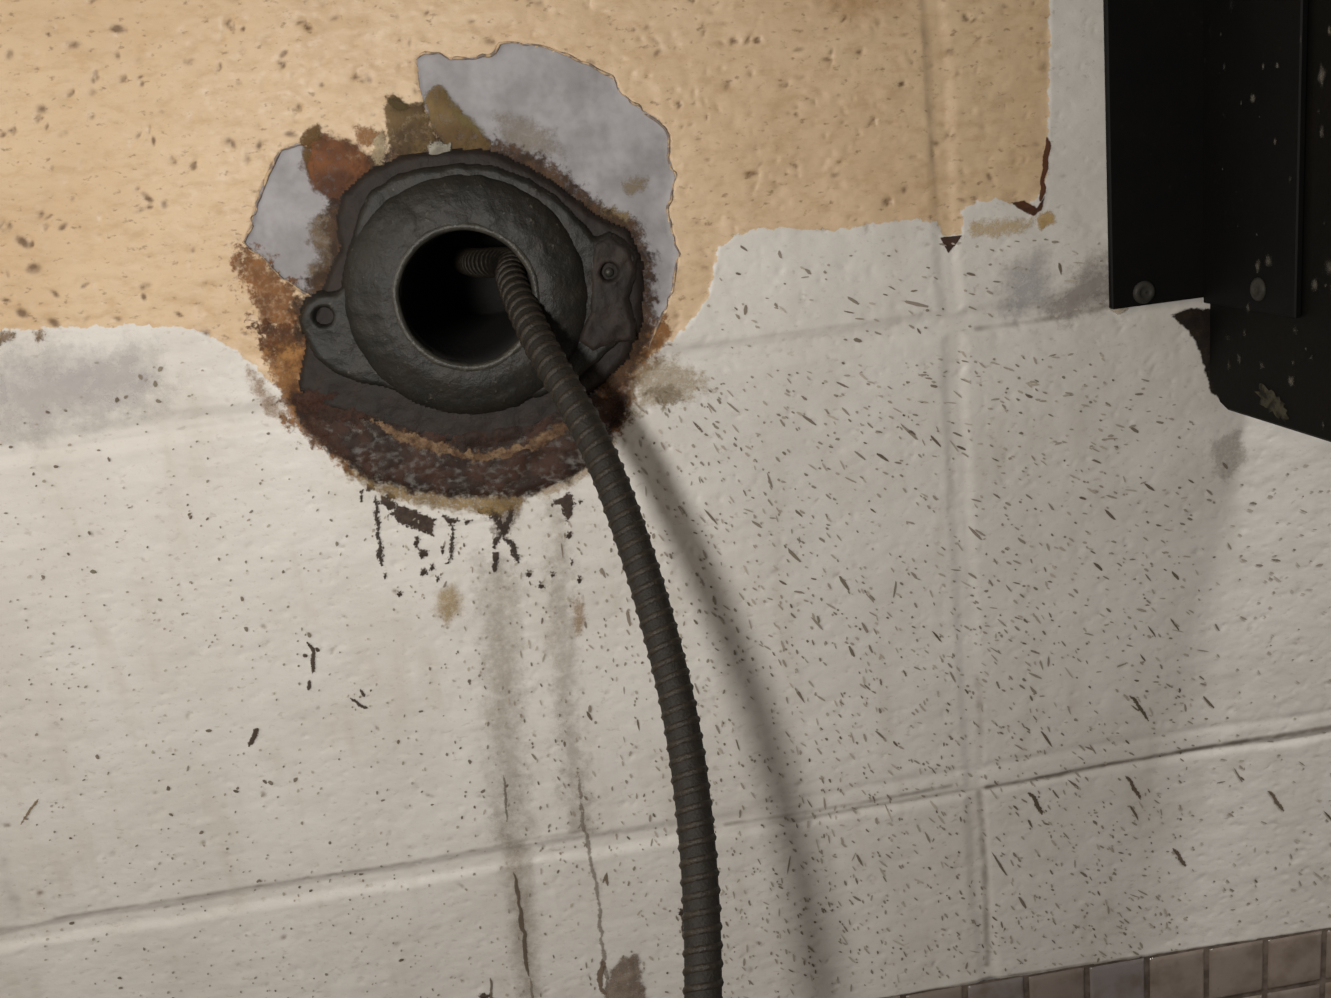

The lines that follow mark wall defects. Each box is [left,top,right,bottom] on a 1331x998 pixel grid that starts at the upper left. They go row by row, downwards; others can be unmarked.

peeling [388,98,408,111]
peeling [242,144,334,297]
peeling [417,41,680,349]
peeling [941,235,962,253]
peeling [1012,137,1051,216]
rust [230,124,588,515]
rust [487,124,706,444]
crack [501,778,509,822]
crack [513,872,534,998]
crack [478,978,493,998]
crack [597,959,607,995]